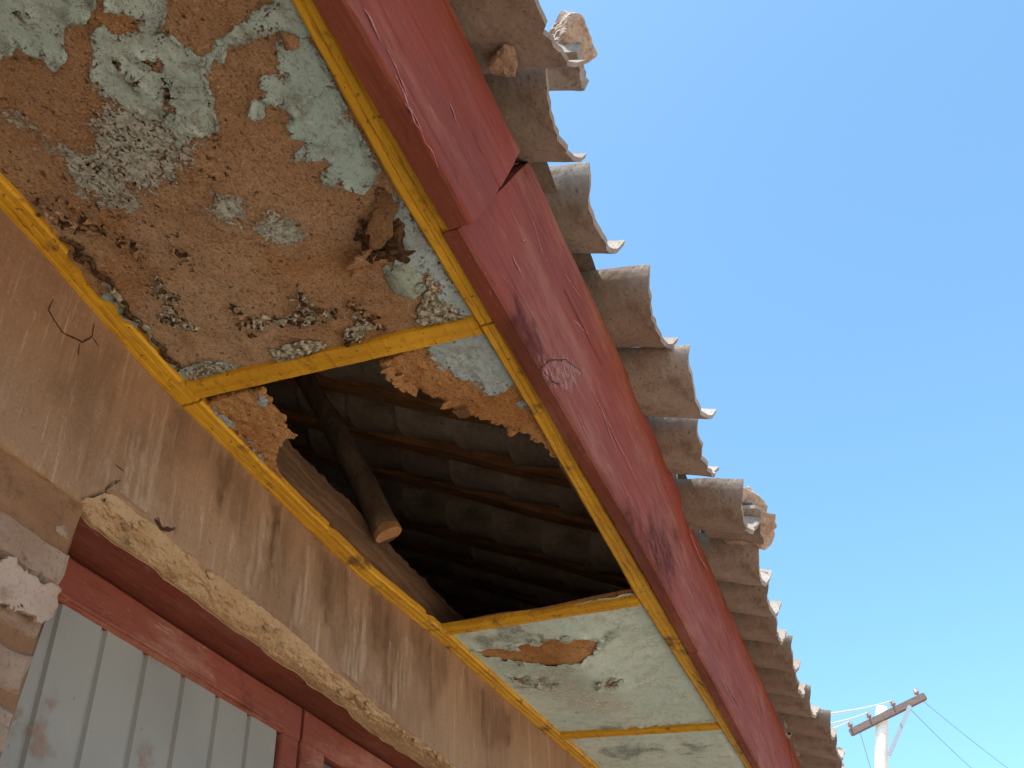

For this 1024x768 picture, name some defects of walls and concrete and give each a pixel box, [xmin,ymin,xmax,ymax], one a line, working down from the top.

peeling [0,0,466,381]
crack [48,300,98,355]
peeling [381,366,418,397]
peeling [0,556,62,624]
peeling [470,635,599,689]